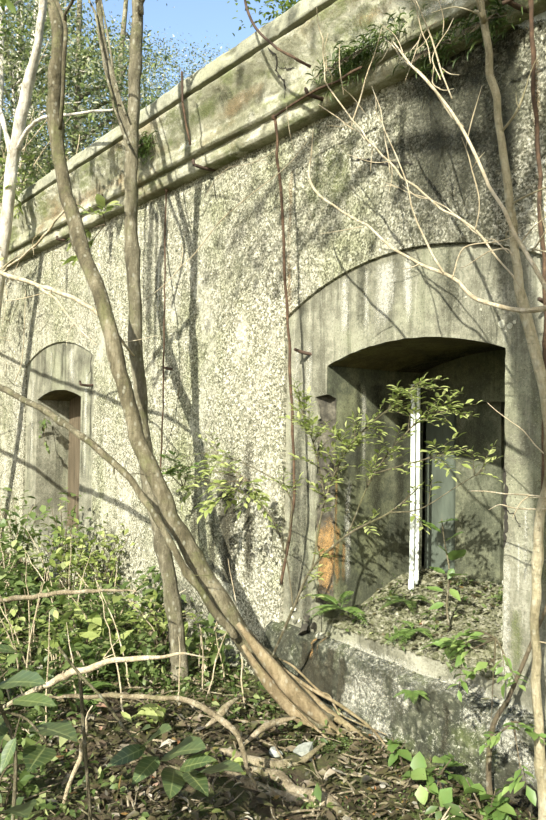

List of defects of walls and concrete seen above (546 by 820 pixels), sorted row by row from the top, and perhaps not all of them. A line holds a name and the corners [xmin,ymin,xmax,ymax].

crack [268,48,295,97]
damp [138,204,160,362]
damp [377,264,393,317]
damp [396,345,505,373]
damp [231,447,259,575]
rust [316,477,345,587]